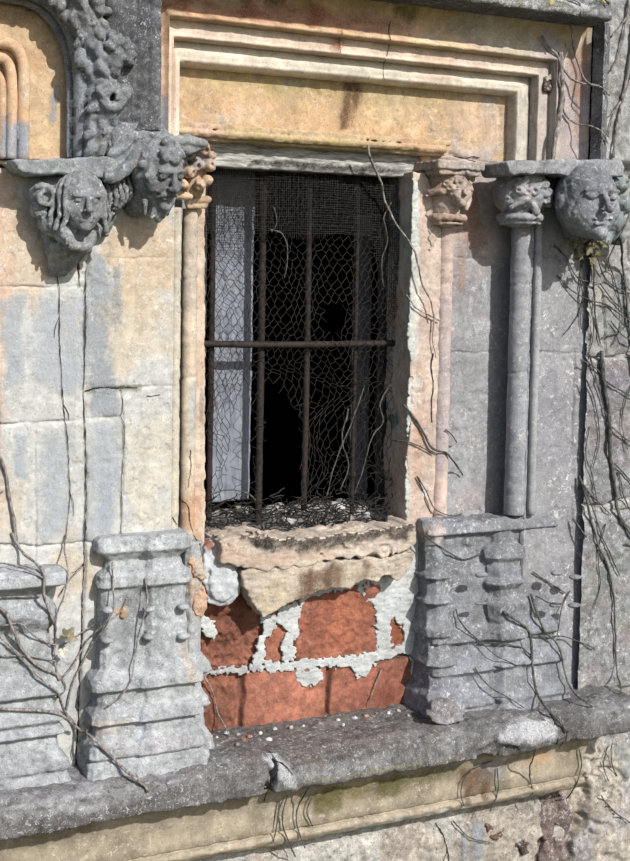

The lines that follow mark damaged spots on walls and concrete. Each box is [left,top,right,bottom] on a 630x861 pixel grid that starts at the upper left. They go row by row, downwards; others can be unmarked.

water stain [103,0,170,131]
water stain [372,0,612,159]
crack [54,258,157,767]
flaking render [203,533,419,688]
crack [264,749,293,801]
spalling [515,791,573,861]